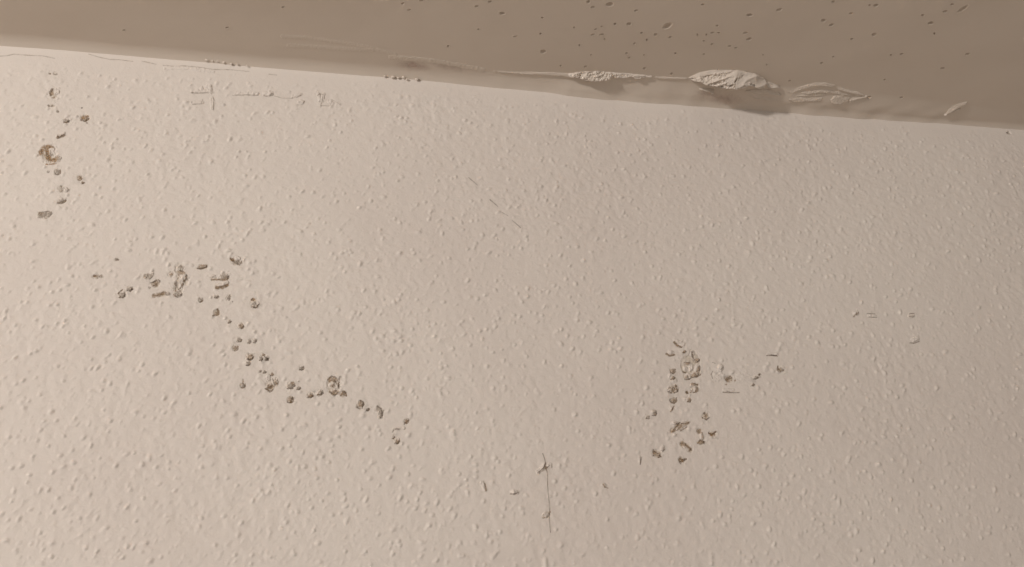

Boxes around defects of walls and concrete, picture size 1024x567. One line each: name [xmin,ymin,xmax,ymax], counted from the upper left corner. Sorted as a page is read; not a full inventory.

flaking render [44,69,93,139]
flaking render [689,69,781,101]
flaking render [34,165,88,222]
flaking render [114,254,413,448]
flaking render [642,346,720,467]
flaking render [717,363,787,389]